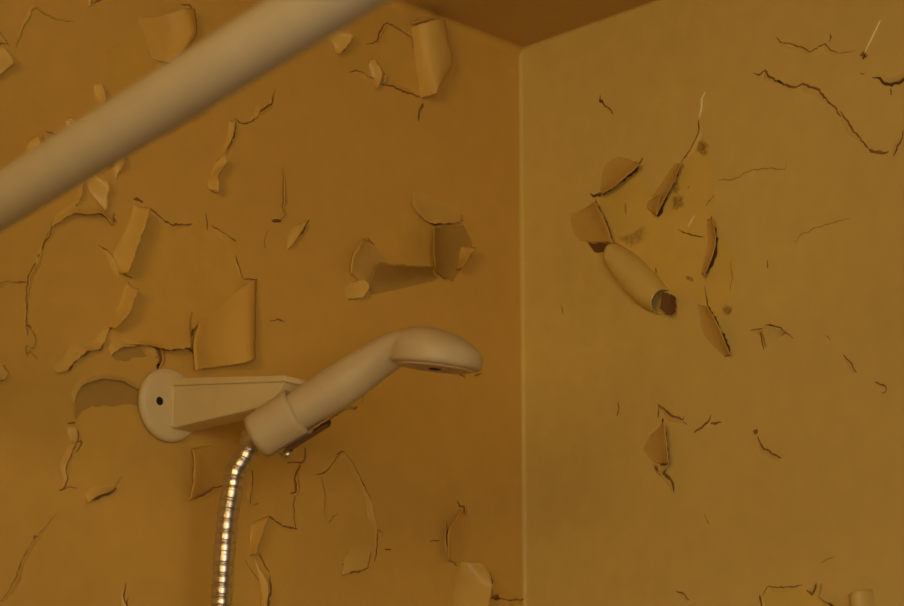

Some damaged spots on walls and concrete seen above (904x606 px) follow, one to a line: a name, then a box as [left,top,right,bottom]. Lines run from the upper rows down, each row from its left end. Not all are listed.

peeling [94,4,197,105]
peeling [351,16,453,121]
crack [776,33,856,55]
crack [753,70,903,157]
peeling [17,159,125,358]
peeling [53,197,257,373]
peeling [344,191,477,300]
peeling [571,92,735,357]
peeling [60,371,142,503]
crack [275,396,391,575]
crack [0,516,54,603]
peeling [453,560,524,606]